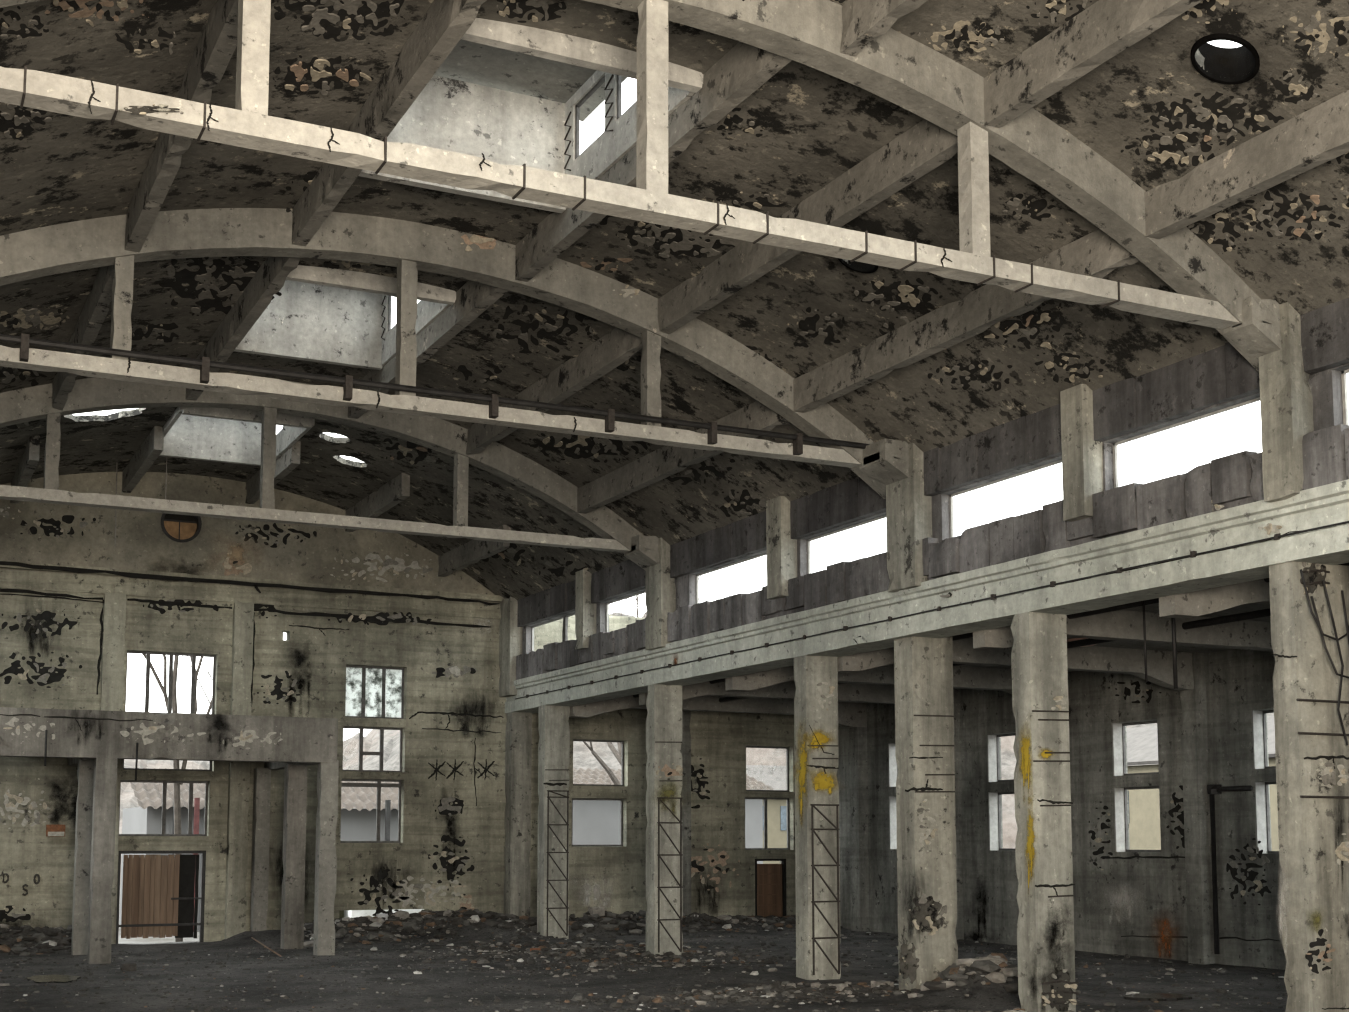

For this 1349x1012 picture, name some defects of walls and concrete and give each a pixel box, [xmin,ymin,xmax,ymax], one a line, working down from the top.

spalling [896,893,947,986]